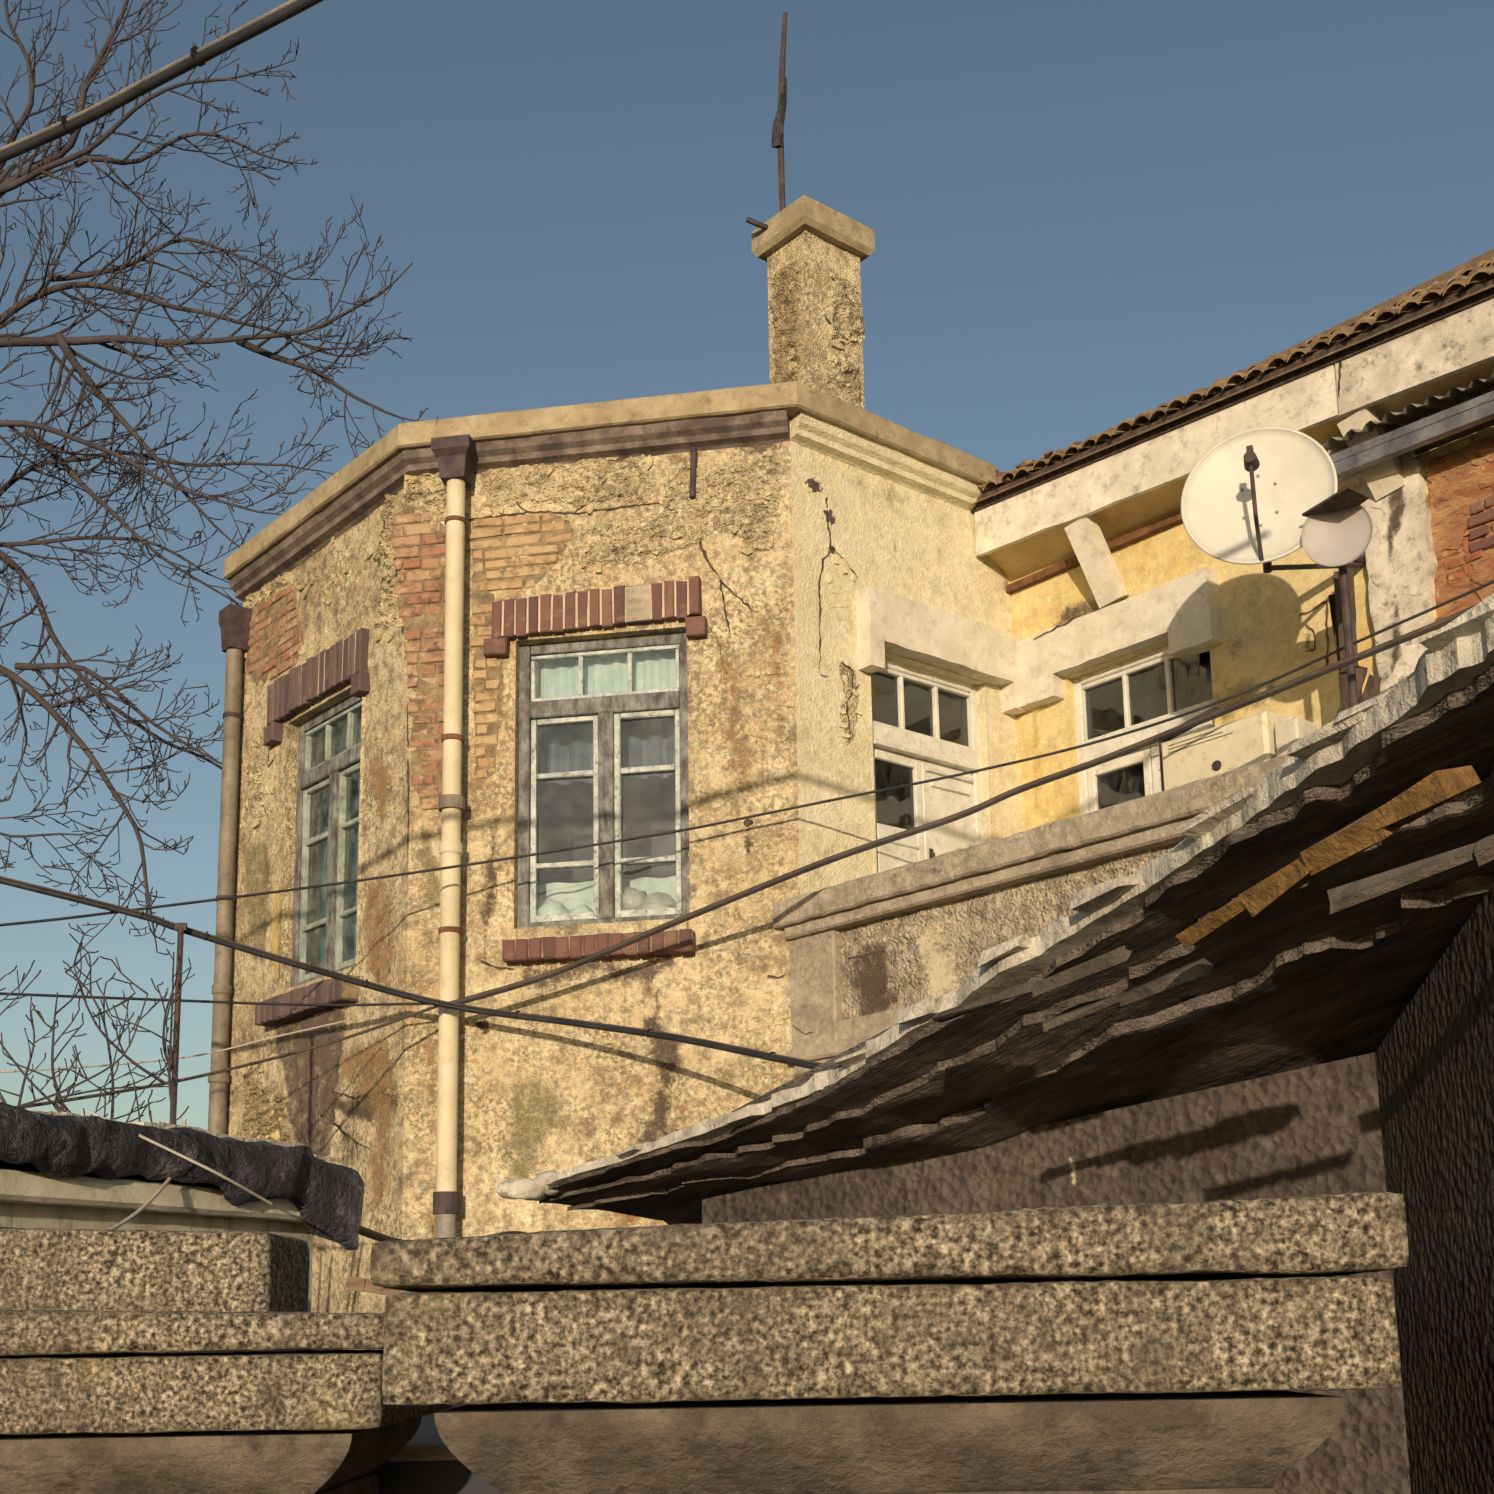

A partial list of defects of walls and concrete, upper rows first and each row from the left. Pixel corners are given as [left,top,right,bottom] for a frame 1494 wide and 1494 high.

spalling [769,257,802,383]
spalling [821,272,865,409]
spalling [243,536,353,692]
spalling [363,472,447,822]
crack [467,478,756,683]
spalling [462,453,788,791]
crack [818,497,859,741]
peeling [1370,433,1494,693]
peeling [246,727,275,828]
spalling [240,1062,293,1142]
damp [276,1006,397,1207]
damp [524,956,683,1144]